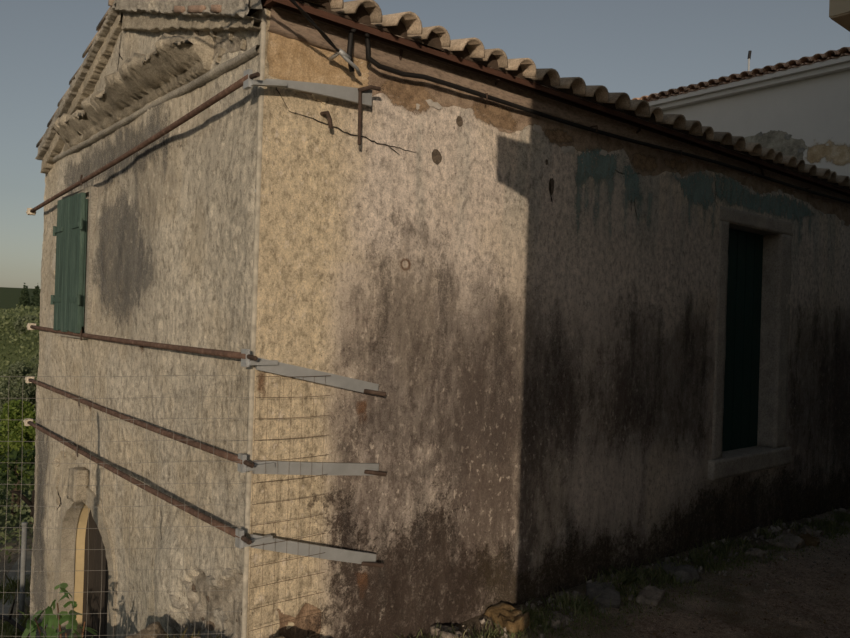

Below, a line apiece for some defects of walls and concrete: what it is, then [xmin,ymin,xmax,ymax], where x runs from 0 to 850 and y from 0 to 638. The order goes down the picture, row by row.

peeling [267,31,850,228]
damp [302,482,498,638]